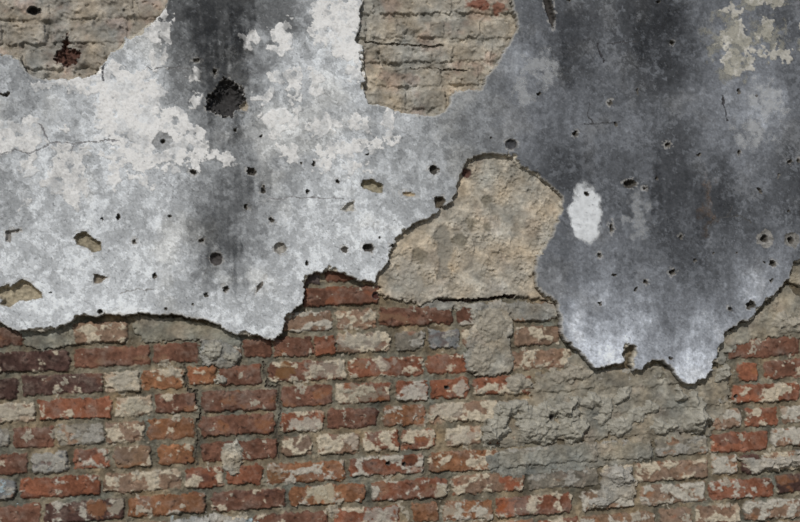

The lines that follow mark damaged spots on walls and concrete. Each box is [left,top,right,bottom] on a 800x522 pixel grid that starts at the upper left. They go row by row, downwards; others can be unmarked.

peeling [713,0,800,77]
crack [0,123,120,155]
spalling [0,0,241,212]
spalling [237,0,516,193]
spalling [373,138,561,307]
efflorescence [568,181,602,244]
peeling [0,279,43,308]
peeling [93,273,108,284]